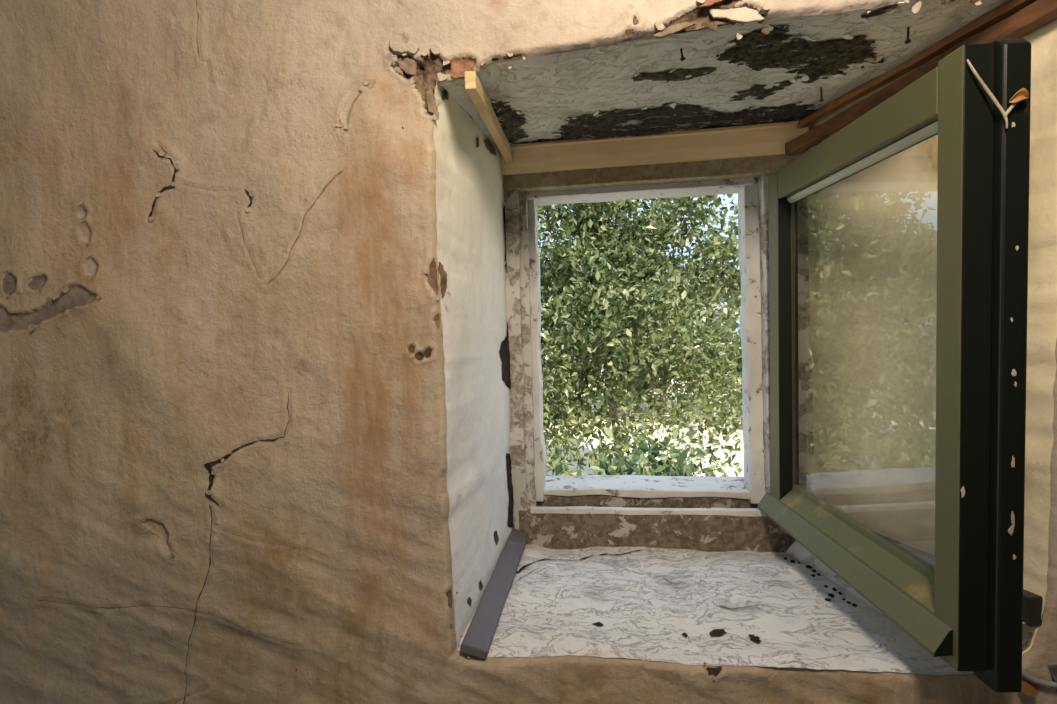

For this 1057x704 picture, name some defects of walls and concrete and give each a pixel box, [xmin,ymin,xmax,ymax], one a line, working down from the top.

flaking render [386,35,525,121]
peeling [491,0,885,145]
peeling [861,0,922,22]
peeling [476,135,496,156]
flaking render [0,202,101,336]
crack [148,147,343,283]
crack [39,395,322,704]